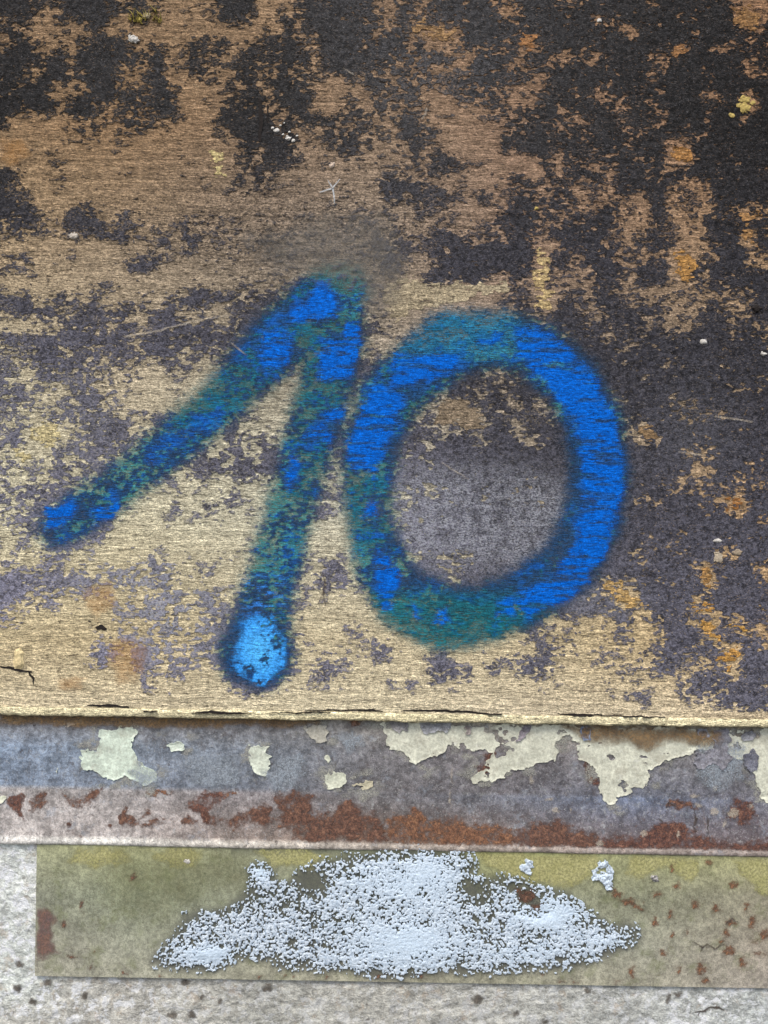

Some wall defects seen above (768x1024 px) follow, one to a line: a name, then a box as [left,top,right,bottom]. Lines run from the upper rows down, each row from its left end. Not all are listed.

rust [7,792,47,817]
rust [64,788,102,808]
peeling [78,723,165,796]
rust [108,807,158,827]
peeling [158,733,194,755]
peeling [241,743,272,777]
peeling [296,721,379,801]
rust [181,789,768,865]
peeling [369,721,768,815]
efflorescence [152,844,641,981]
rust [609,886,643,911]
rust [712,903,768,967]